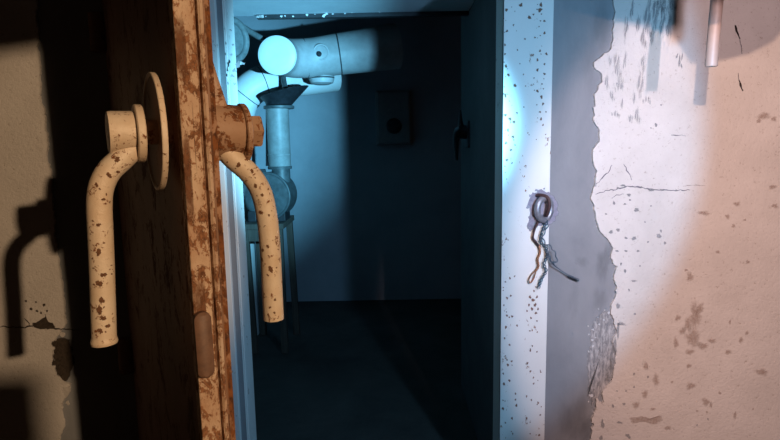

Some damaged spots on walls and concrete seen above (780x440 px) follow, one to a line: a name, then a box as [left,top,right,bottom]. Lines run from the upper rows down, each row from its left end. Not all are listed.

crack [595,165,699,197]
crack [1,315,76,330]
spalling [25,300,75,405]
peeling [587,304,624,405]